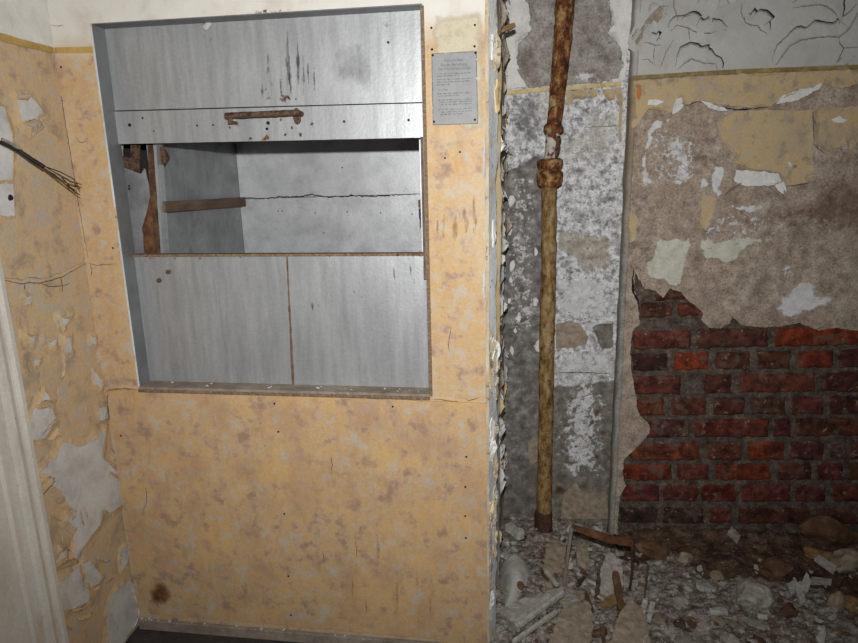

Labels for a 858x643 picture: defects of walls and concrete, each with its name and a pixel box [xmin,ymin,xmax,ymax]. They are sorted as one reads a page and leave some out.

peeling [0,89,49,219]
crack [5,97,110,292]
water stain [280,38,315,91]
peeling [566,0,858,231]
crack [643,0,858,70]
peeling [17,308,140,643]
peeling [434,0,556,620]
flaking render [555,321,588,348]
spalling [560,274,858,533]
corrosion [152,585,168,601]